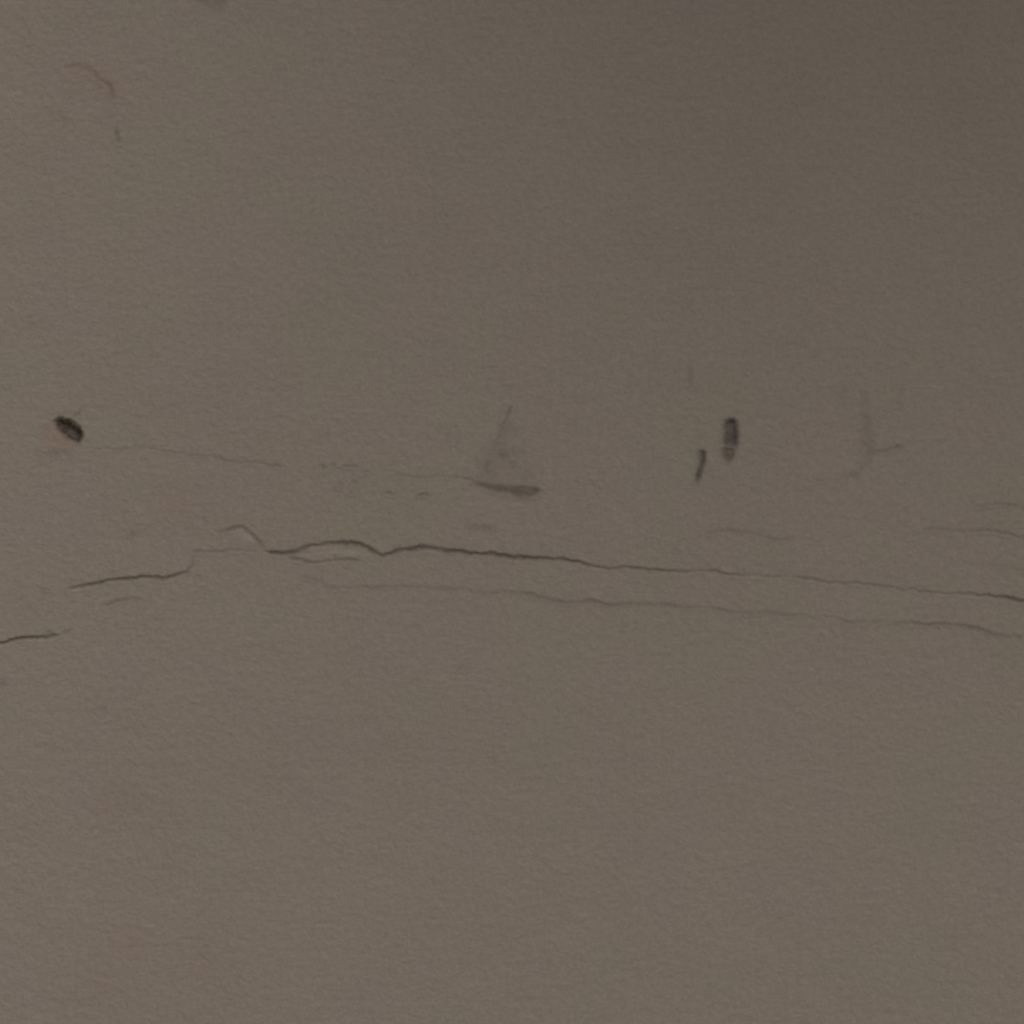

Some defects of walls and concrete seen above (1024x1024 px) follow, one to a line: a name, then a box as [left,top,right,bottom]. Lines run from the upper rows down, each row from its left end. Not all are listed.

crack [62,523,1024,608]
crack [0,627,76,648]